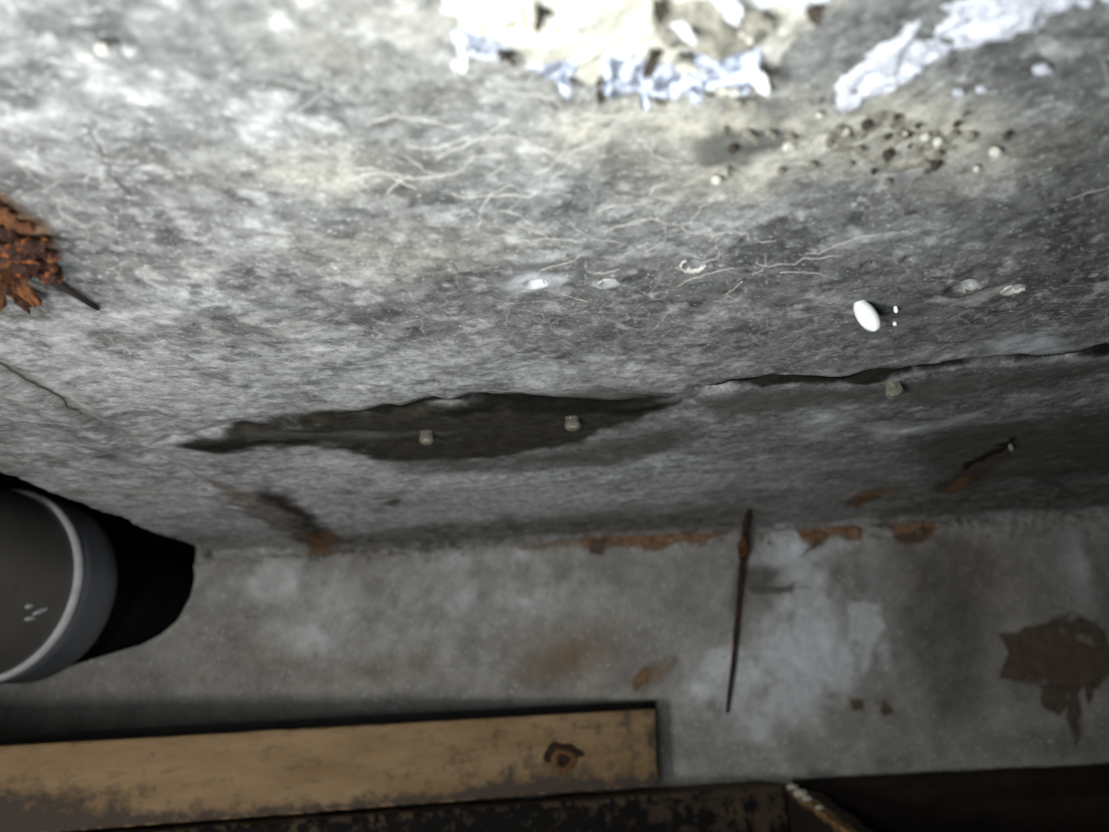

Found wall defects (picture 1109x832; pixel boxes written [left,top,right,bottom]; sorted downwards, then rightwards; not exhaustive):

peeling [440,0,843,112]
spalling [695,125,797,185]
spalling [826,109,978,186]
spalling [988,132,1012,158]
rust [0,194,100,315]
crack [704,357,977,387]
crack [1006,344,1109,359]
water stain [177,390,678,472]
crack [330,393,680,414]
rust [522,532,722,554]
rust [797,525,862,553]
rust [1001,616,1109,743]